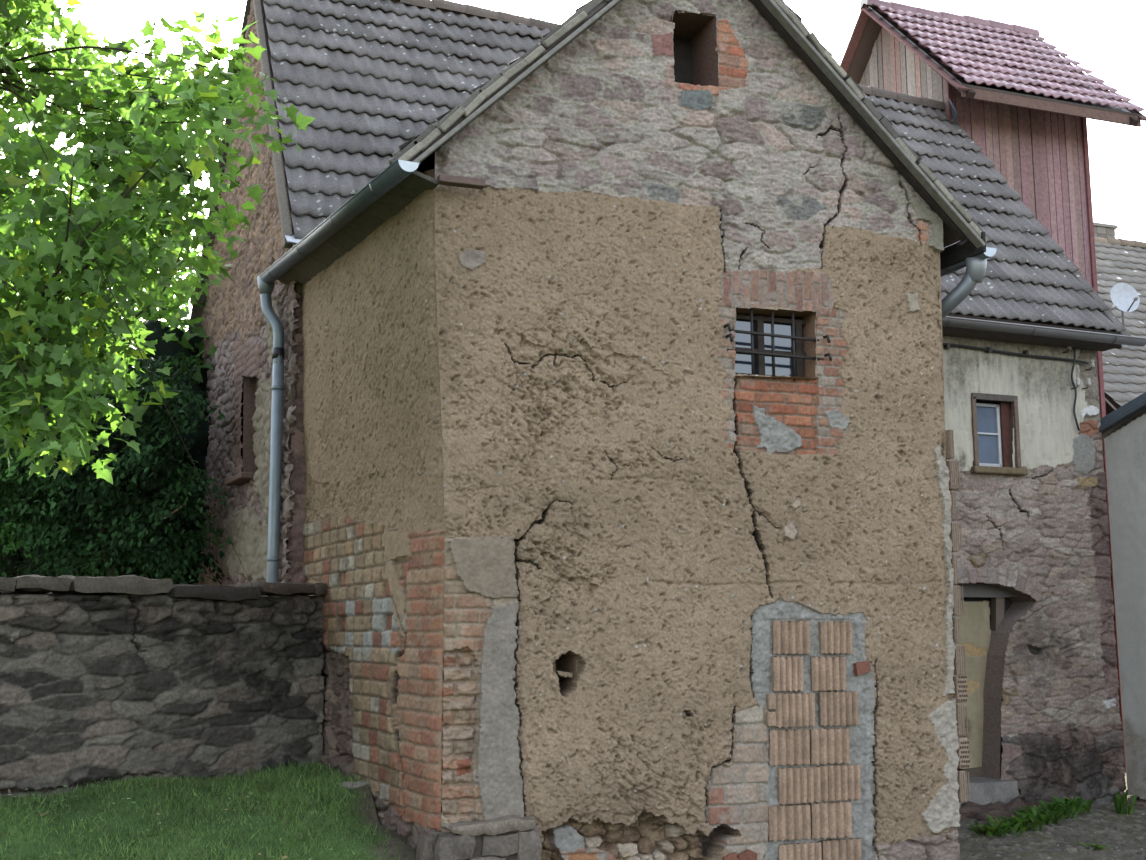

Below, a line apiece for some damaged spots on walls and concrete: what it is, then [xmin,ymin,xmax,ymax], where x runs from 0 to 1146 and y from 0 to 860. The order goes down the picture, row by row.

crack [719,208,771,273]
crack [803,116,849,269]
peeling [910,198,944,250]
peeling [441,536,599,823]
crack [513,498,574,816]
spalling [541,811,741,860]